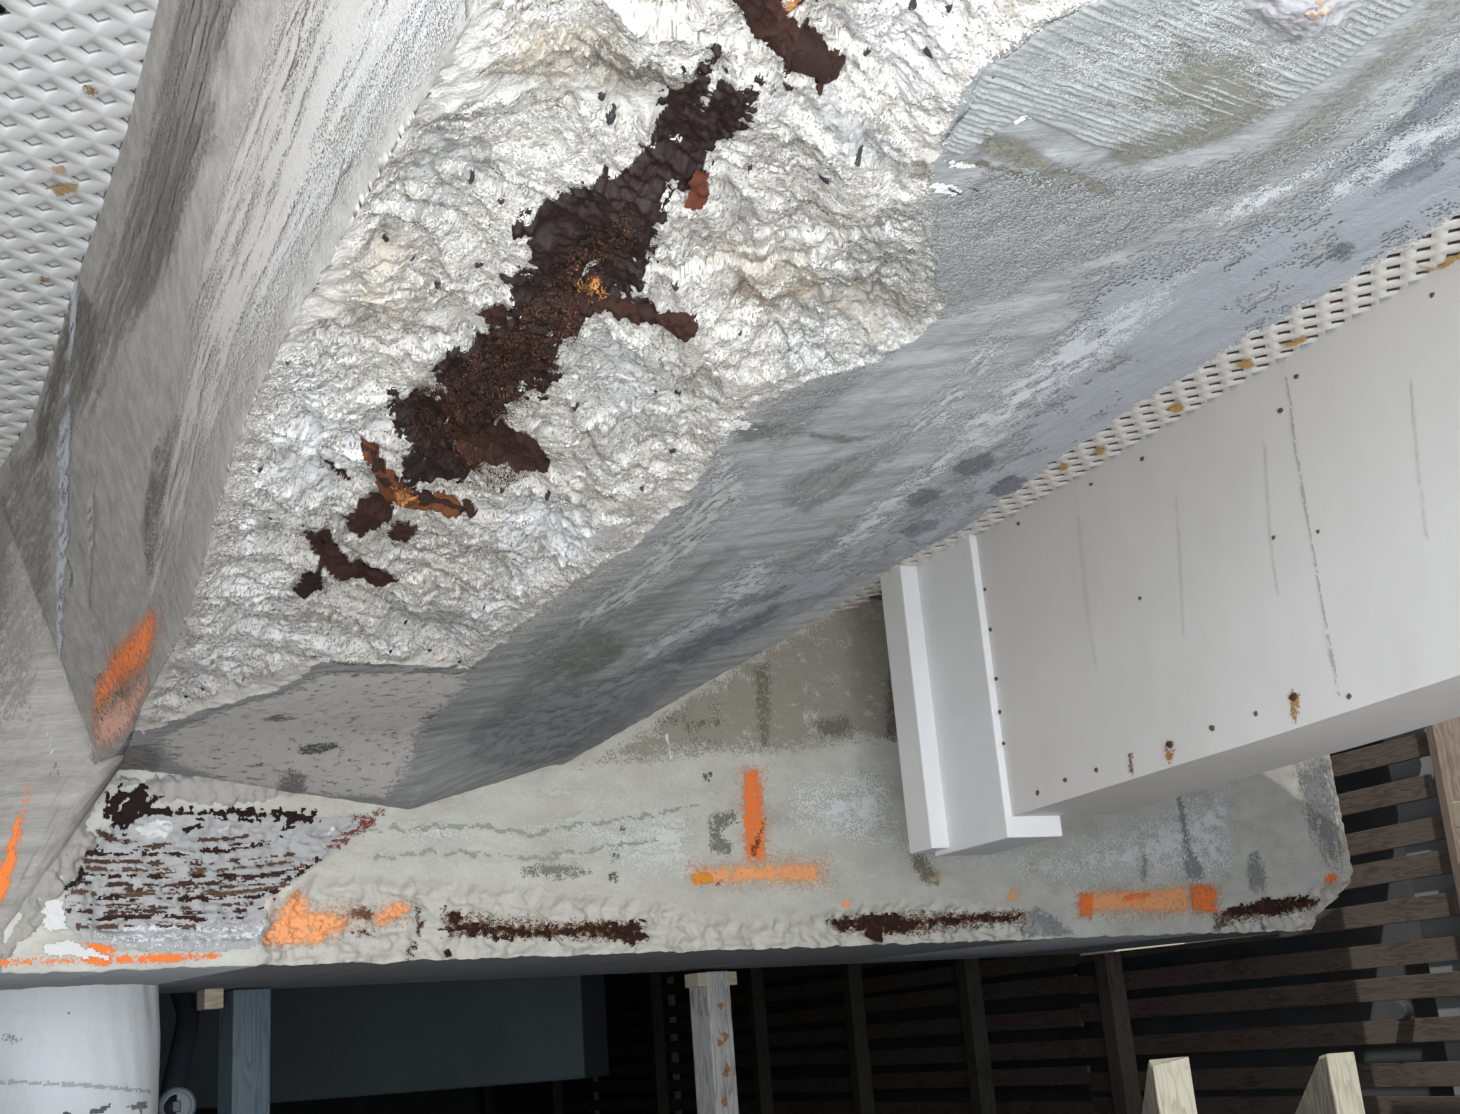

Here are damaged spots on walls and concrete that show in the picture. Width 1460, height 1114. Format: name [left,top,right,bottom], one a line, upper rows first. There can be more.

rust [293,0,840,599]
spalling [135,0,1089,735]
rust [65,783,386,931]
rust [406,905,649,961]
spalling [62,800,1054,966]
rust [825,907,1028,943]
rust [1212,895,1323,932]